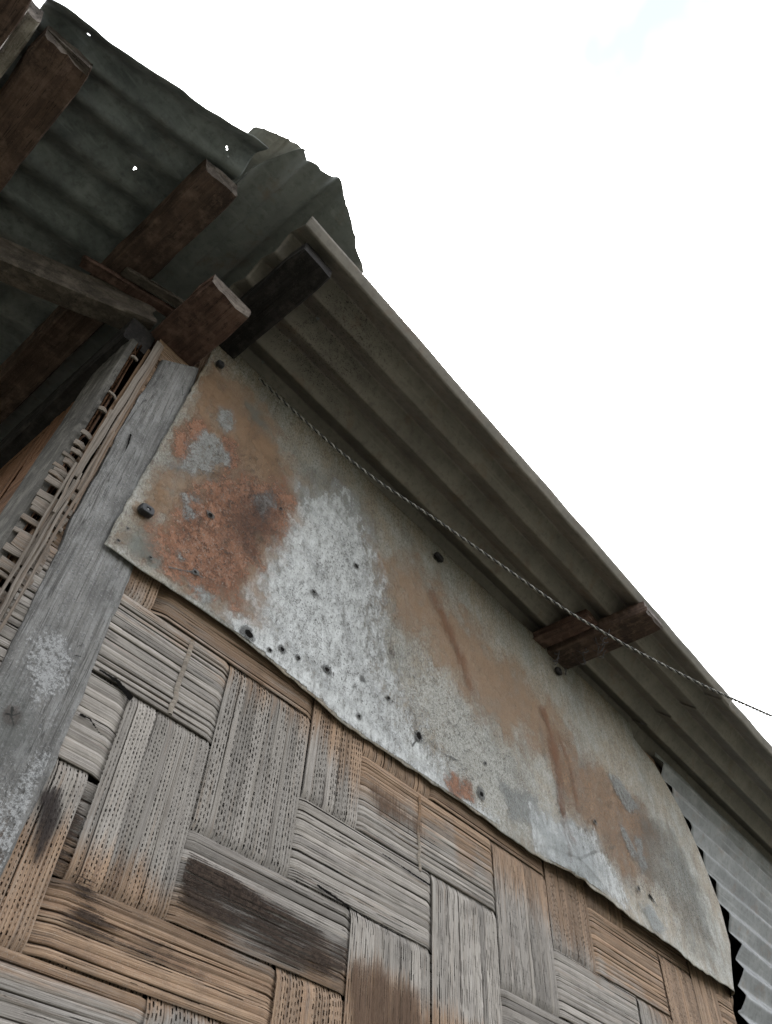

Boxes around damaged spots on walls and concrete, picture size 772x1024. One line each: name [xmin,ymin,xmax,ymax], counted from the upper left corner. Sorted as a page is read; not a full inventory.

corrosion [142,434,298,612]
damp [33,786,87,875]
damp [175,852,428,1024]